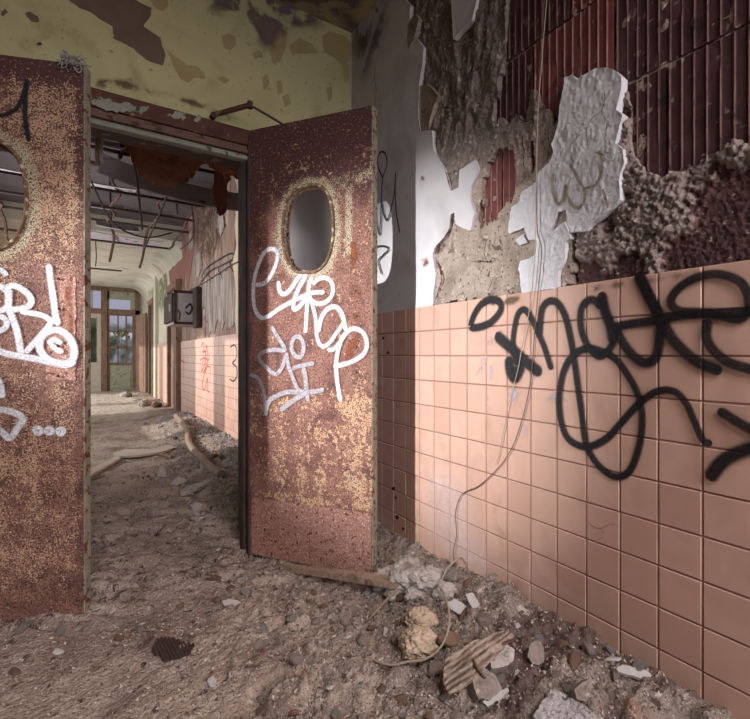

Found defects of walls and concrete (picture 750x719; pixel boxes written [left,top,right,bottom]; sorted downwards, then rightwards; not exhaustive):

peeling [66,0,205,83]
peeling [252,29,351,83]
flaking render [408,0,750,305]
peeling [169,208,238,335]